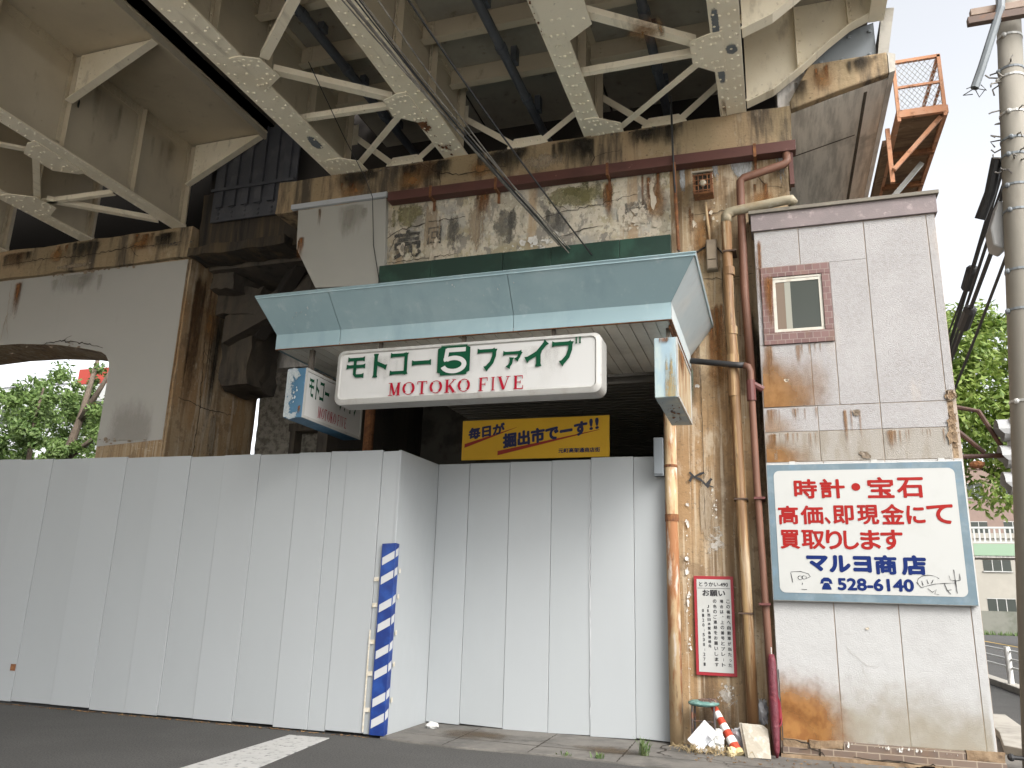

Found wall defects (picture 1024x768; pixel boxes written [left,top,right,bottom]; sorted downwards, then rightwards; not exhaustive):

damp [403,160,449,176]
damp [478,138,594,169]
crack [544,194,635,239]
rust [603,183,612,210]
peeling [602,180,659,242]
rust [641,173,663,214]
peeling [512,231,564,249]
crack [43,336,102,348]
rust [763,364,811,407]
rust [765,425,797,462]
rust [780,686,843,742]